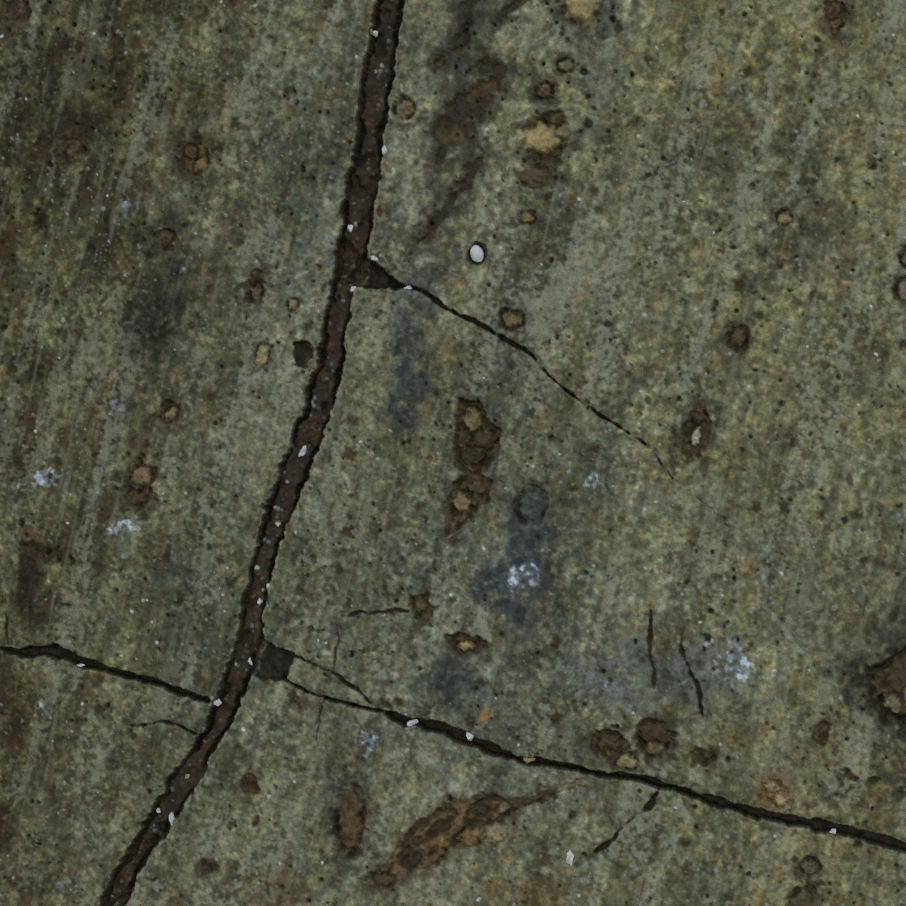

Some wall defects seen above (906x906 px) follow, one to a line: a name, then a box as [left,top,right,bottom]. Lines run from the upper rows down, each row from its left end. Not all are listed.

spalling [345,0,618,400]
flaking render [884,238,906,311]
crack [0,0,412,906]
spalling [431,389,566,546]
crack [359,257,730,529]
crack [315,623,906,856]
crack [646,609,659,692]
spalling [580,706,729,776]
spalling [807,713,839,758]
spalling [838,599,906,754]
spalling [316,773,589,903]